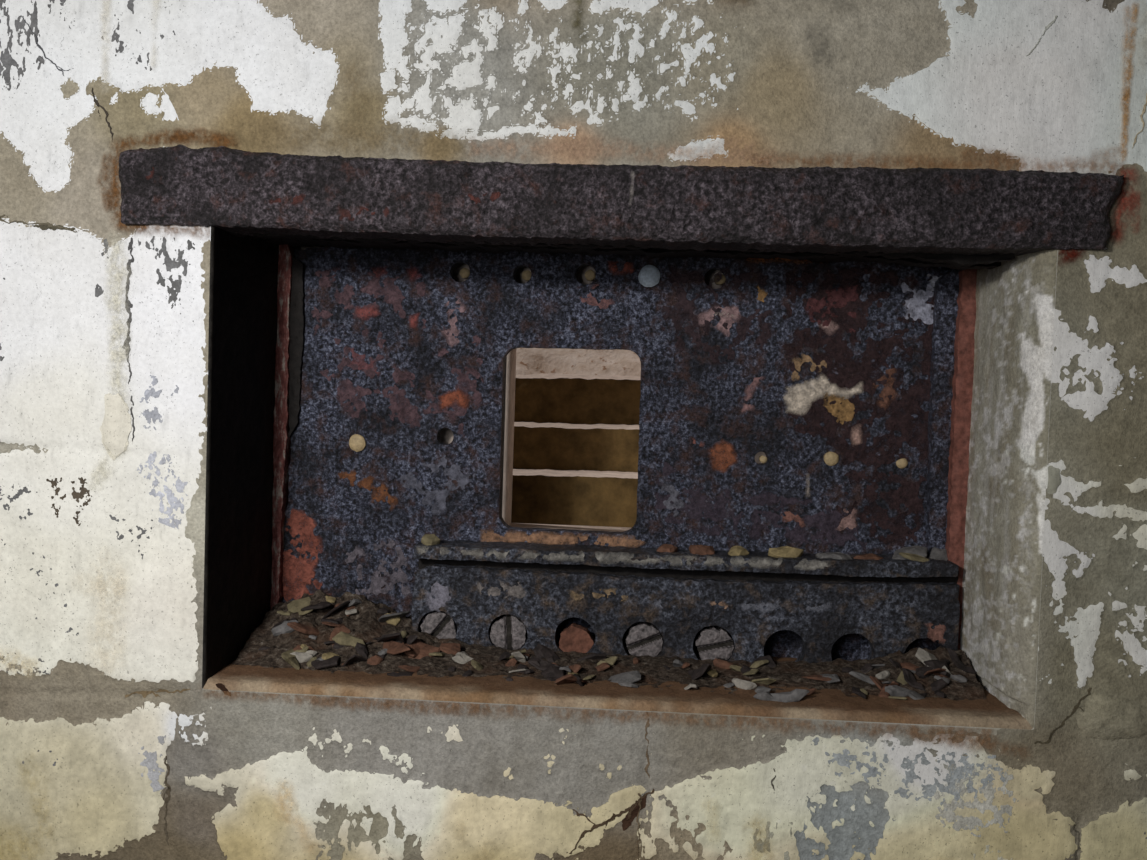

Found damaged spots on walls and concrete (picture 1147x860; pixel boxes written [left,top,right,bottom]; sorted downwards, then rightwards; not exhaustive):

peeling [0,0,1021,262]
peeling [138,236,195,309]
peeling [198,240,210,427]
rust [824,394,861,444]
peeling [46,477,92,526]
rust [282,510,330,602]
rust [418,531,948,570]
rust [427,581,451,612]
rust [559,623,594,653]
peeling [312,797,430,860]
crack [569,712,654,860]
peeling [894,747,1014,837]